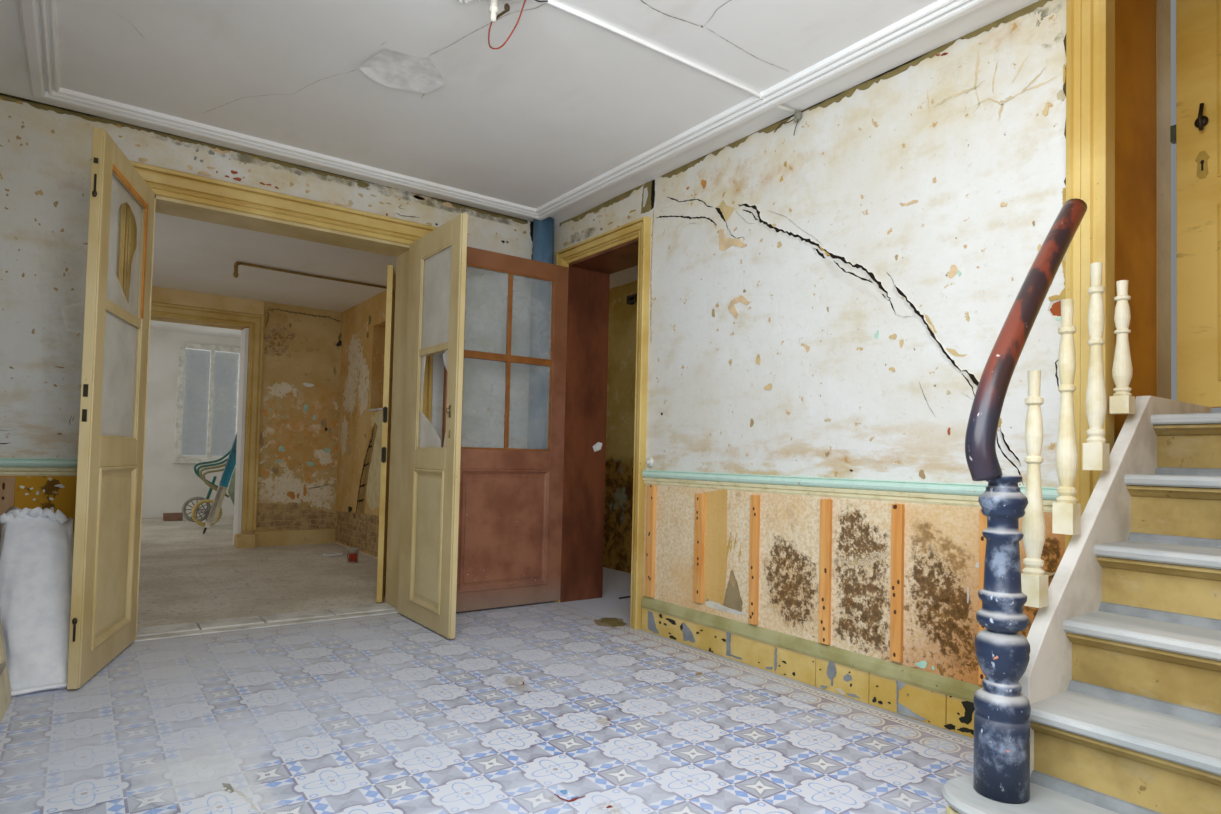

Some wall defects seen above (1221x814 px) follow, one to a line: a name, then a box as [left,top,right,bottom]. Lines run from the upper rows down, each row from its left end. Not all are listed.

crack [429,3,546,56]
crack [641,0,787,71]
crack [658,197,979,400]
peeling [256,315,383,557]
crack [997,426,1024,485]
peeling [648,611,742,660]
spalling [705,570,744,615]
water stain [762,502,891,654]
water stain [906,516,979,672]
water stain [1018,605,1039,638]
water stain [1040,536,1062,588]
peeling [944,696,975,735]